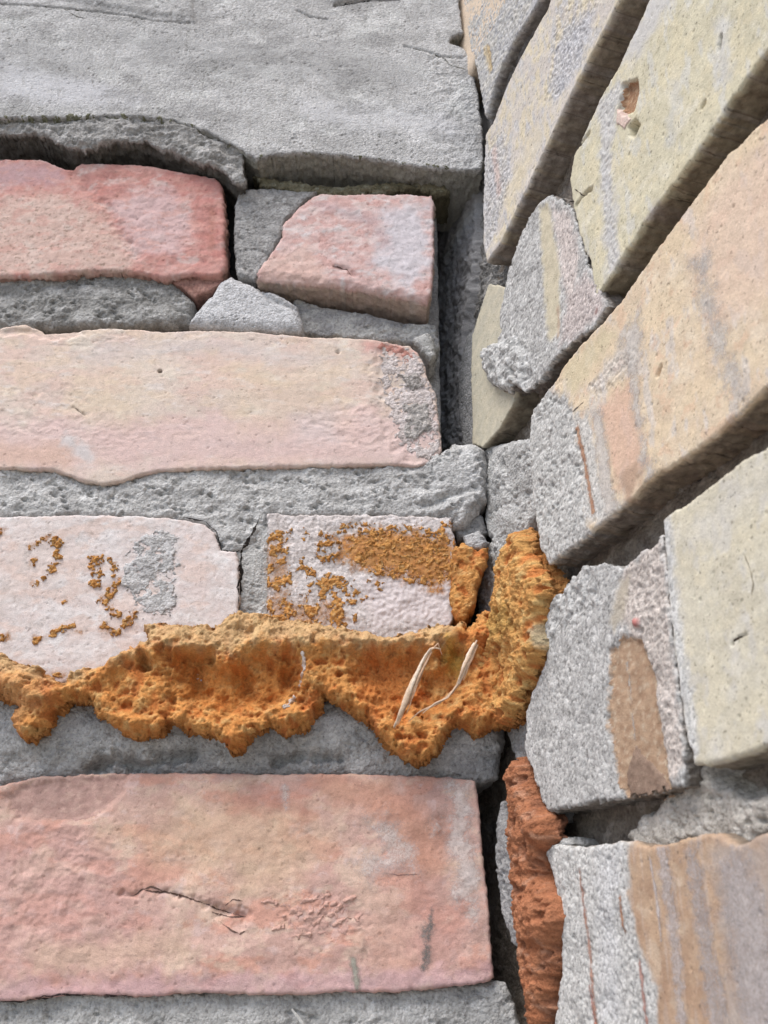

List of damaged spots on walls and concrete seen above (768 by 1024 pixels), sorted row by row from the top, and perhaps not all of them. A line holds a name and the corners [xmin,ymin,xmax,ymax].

peeling [616,81,640,129]
spalling [377,347,442,461]
spalling [121,529,181,620]
crack [186,516,260,608]
crack [124,886,245,935]